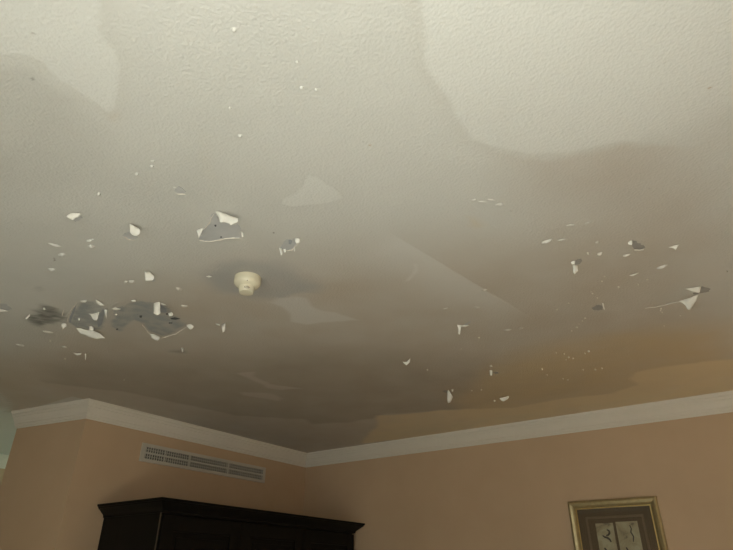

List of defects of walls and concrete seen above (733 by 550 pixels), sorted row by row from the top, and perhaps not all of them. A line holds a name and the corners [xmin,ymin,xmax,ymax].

peeling [123,224,140,240]
peeling [196,211,244,242]
peeling [61,299,194,341]
damp [0,173,733,453]
peeling [679,286,710,310]